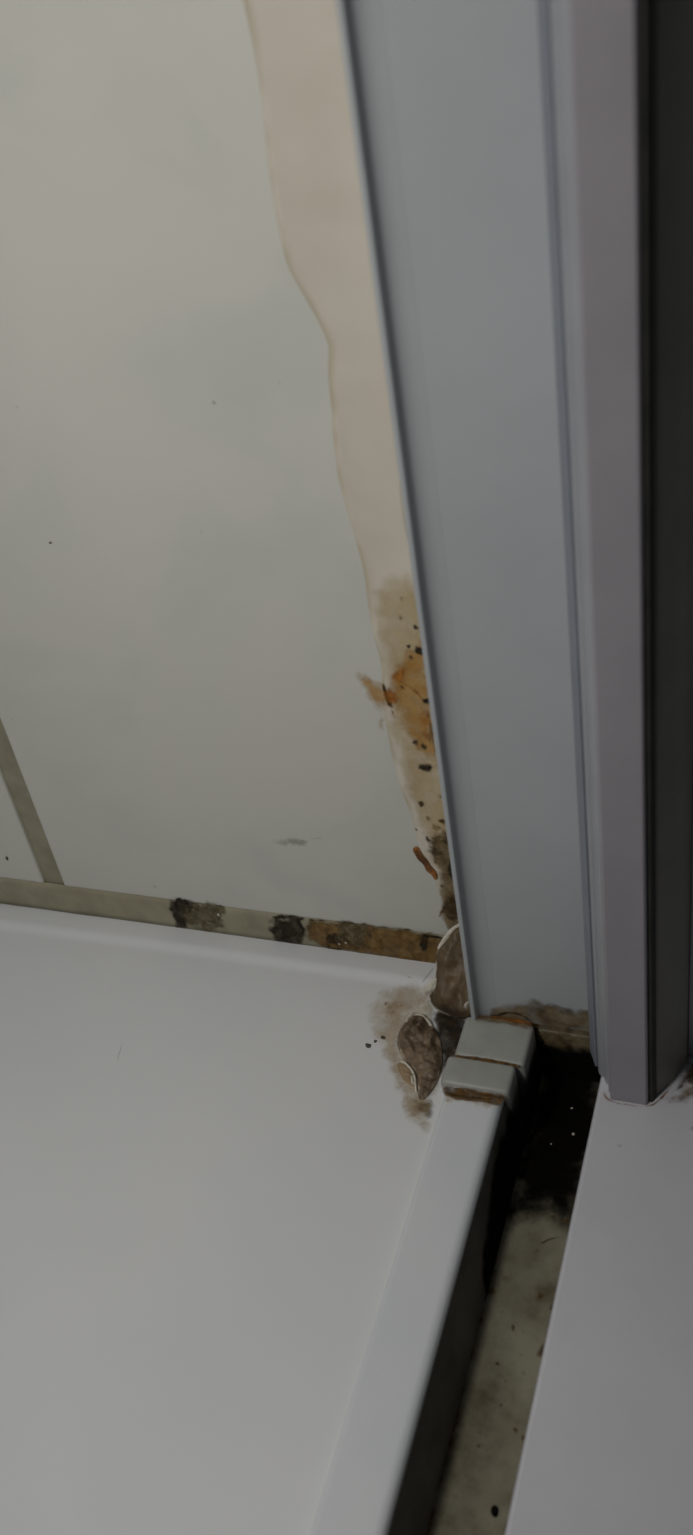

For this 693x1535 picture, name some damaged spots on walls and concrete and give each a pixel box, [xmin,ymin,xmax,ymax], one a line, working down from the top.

rust [385,652,435,753]
damp [269,594,459,963]
damp [169,898,225,932]
peeling [437,923,459,950]
peeling [397,1060,417,1092]
damp [484,1045,611,1292]